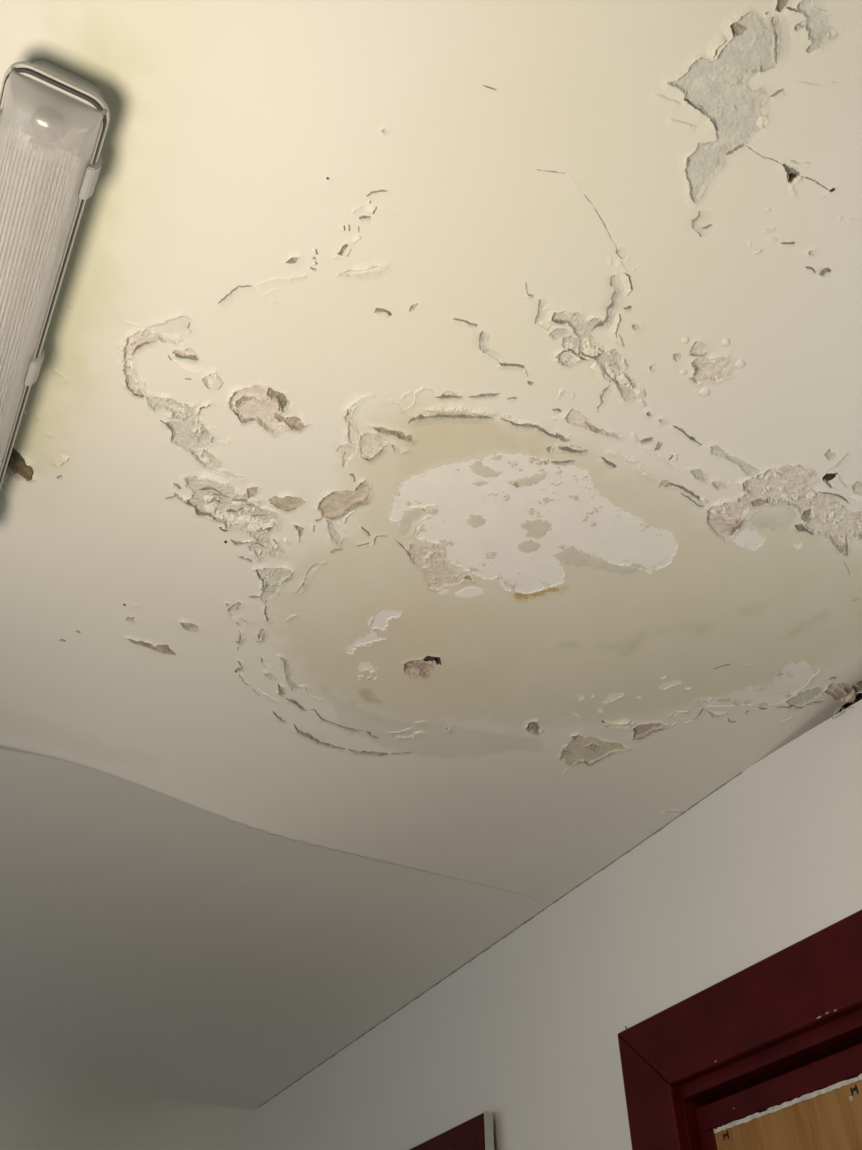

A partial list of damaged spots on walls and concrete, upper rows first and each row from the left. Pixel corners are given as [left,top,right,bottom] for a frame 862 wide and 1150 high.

peeling [653,0,847,237]
crack [746,145,839,200]
spalling [4,445,39,484]
peeling [117,247,862,756]
leakage [250,392,862,762]
peeling [556,660,862,775]